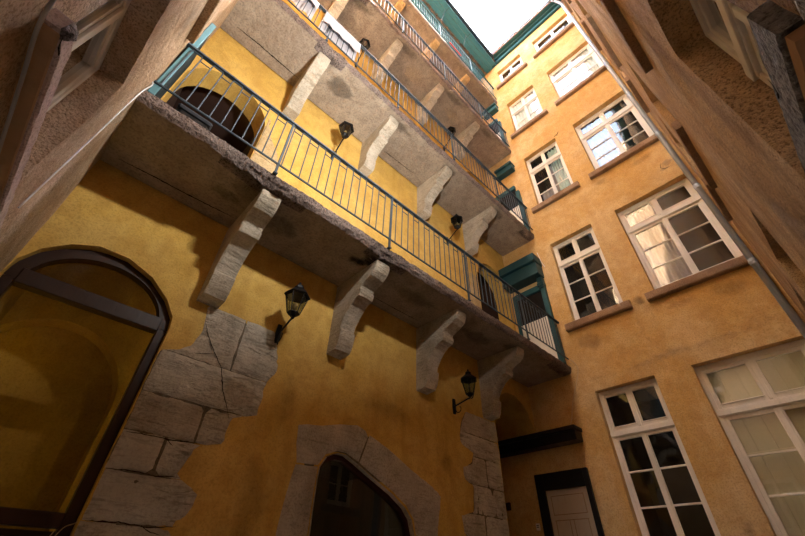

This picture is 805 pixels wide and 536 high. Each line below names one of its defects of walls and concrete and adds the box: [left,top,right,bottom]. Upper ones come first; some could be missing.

flaking render [74,306,278,536]
crack [195,322,229,417]
flaking render [460,412,510,536]